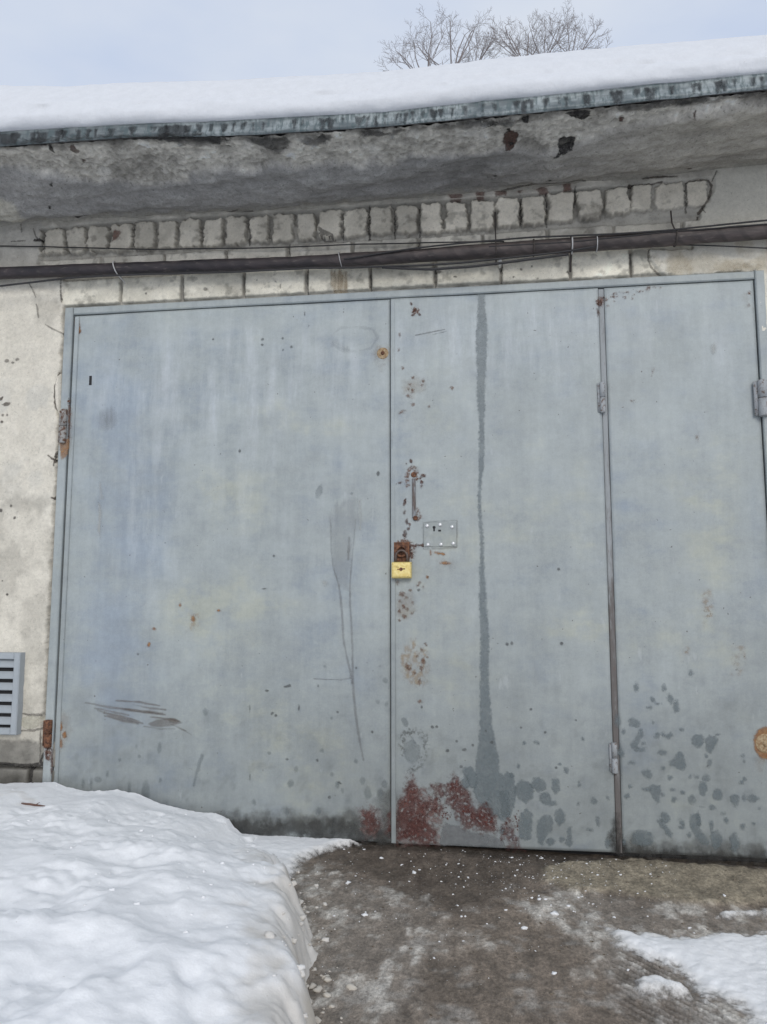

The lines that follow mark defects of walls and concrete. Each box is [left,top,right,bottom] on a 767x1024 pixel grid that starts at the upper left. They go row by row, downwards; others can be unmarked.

spalling [503,116,529,151]
spalling [554,136,575,158]
spalling [566,110,590,120]
crack [626,172,717,220]
rust [60,400,71,457]
water stain [476,294,487,519]
rust [398,459,448,564]
water stain [462,533,572,846]
water stain [693,734,719,757]
rust [754,727,767,759]
water stain [623,751,755,849]